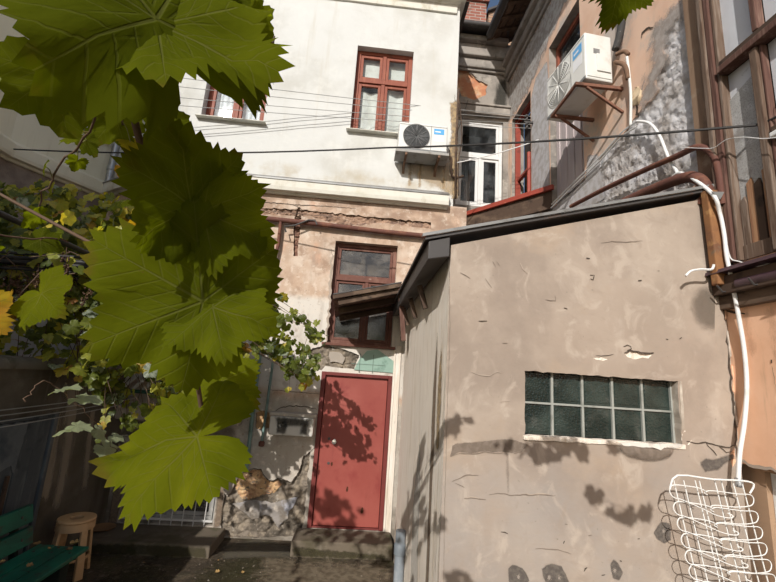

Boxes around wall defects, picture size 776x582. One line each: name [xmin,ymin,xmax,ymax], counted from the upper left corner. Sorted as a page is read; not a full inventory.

flaking render [449,70,487,198]
spalling [310,249,359,370]
spalling [625,345,654,359]
crack [687,310,776,472]
spalling [214,448,314,558]
damp [654,522,671,543]
damp [509,565,529,582]
damp [542,564,568,582]
damp [611,560,622,580]